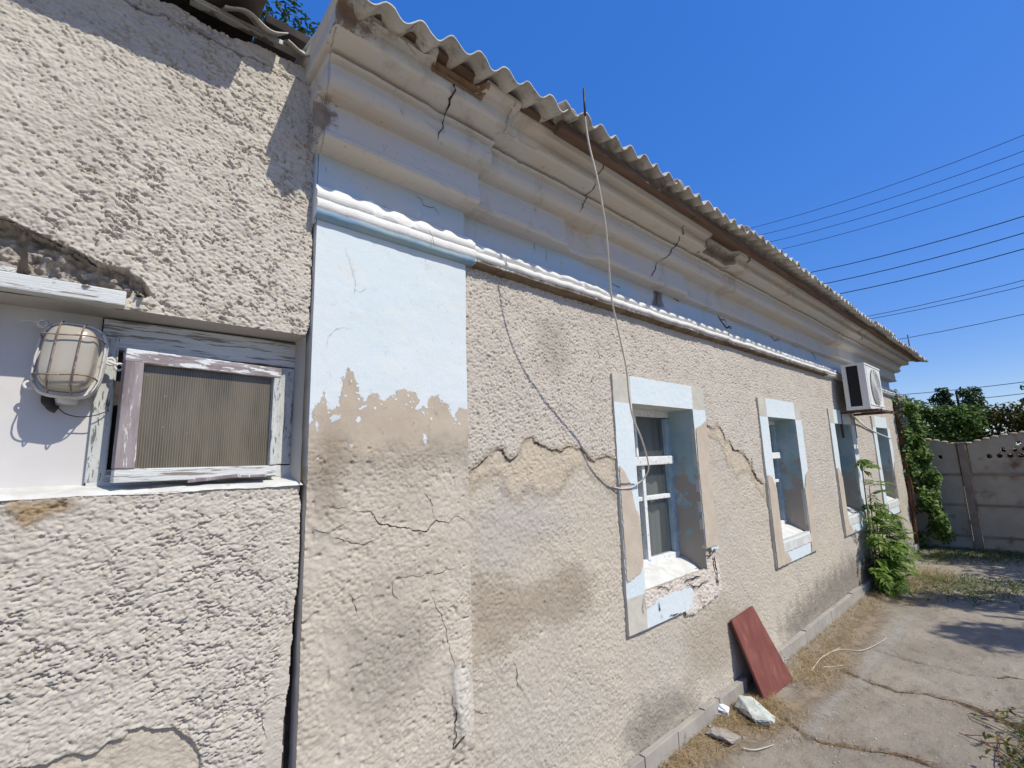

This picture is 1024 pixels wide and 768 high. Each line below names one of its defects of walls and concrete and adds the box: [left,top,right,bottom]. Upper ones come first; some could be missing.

crack [438,75,456,138]
flaking render [0,216,146,299]
crack [313,495,463,545]
flaking render [645,421,792,616]
peeling [296,368,644,768]
crack [392,568,456,667]
crack [843,671,1023,731]